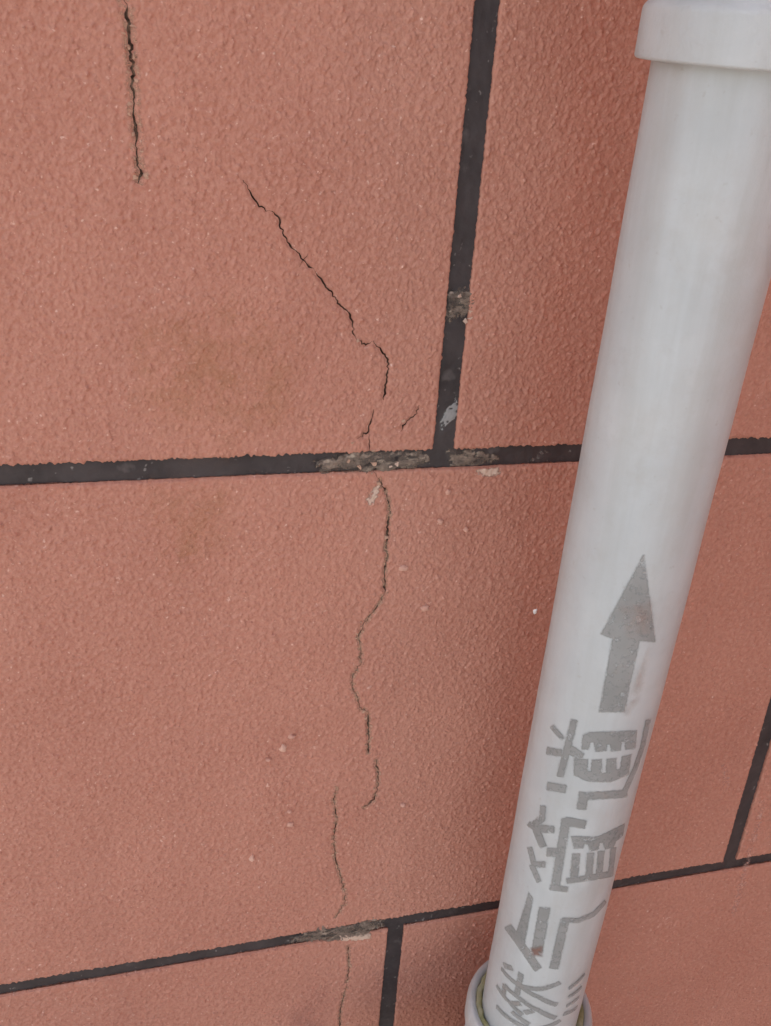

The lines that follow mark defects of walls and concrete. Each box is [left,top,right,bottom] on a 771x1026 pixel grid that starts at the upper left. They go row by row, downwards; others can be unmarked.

crack [118,0,149,185]
crack [243,181,392,809]
crack [331,787,347,918]
crack [339,947,352,1026]